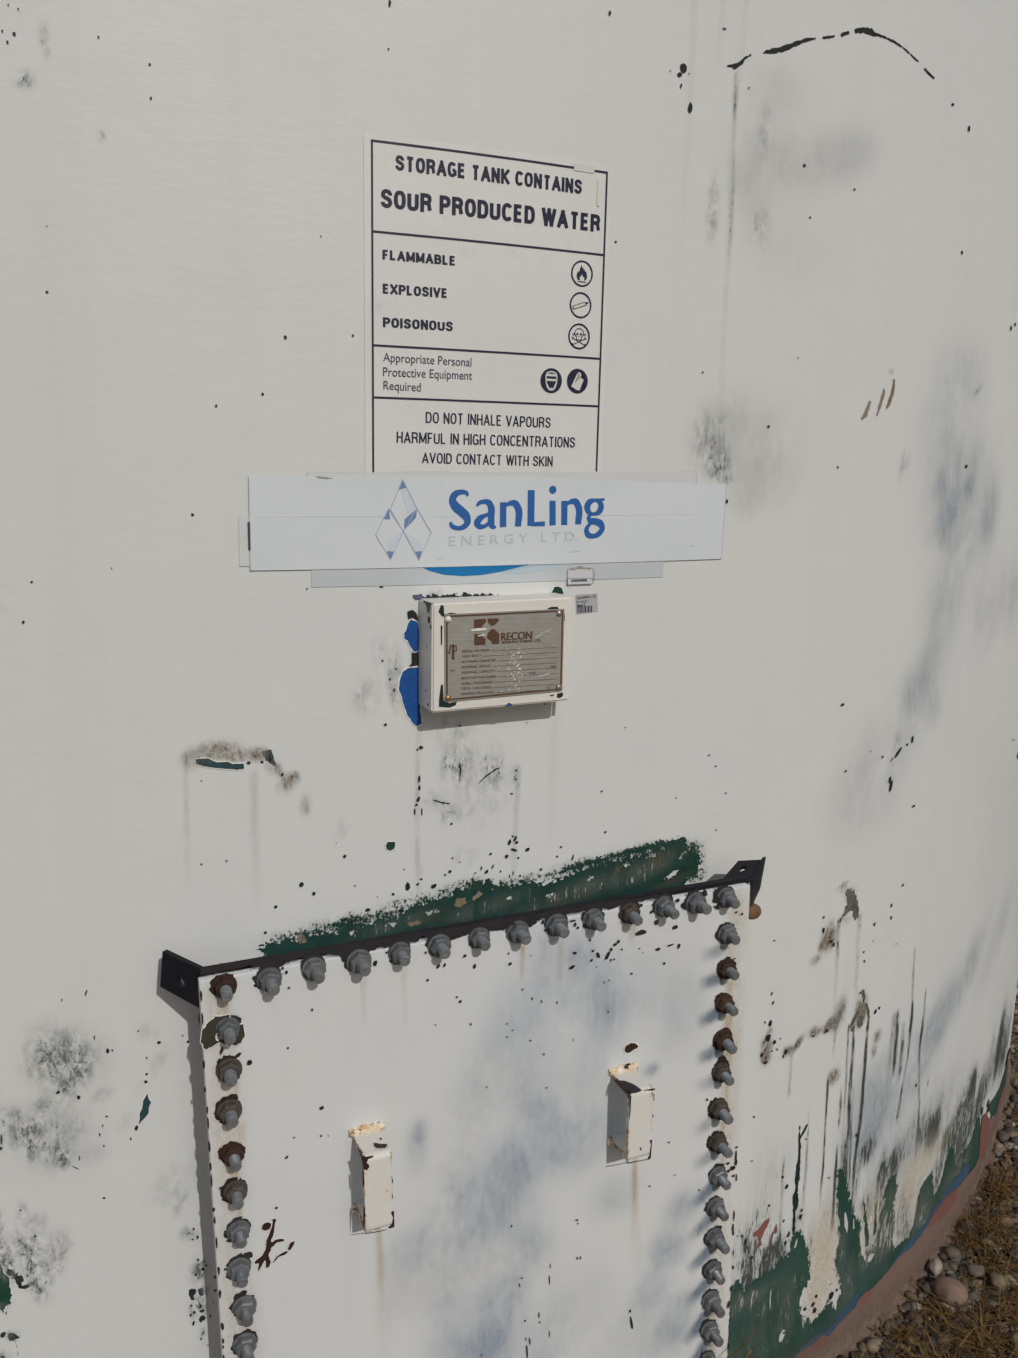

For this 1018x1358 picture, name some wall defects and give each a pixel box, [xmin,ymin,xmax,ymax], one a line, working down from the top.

crack [727,27,970,131]
peeling [186,744,298,787]
spalling [130,1057,152,1140]
peeling [182,835,743,1081]
peeling [850,989,880,1053]
damp [888,967,929,1156]
peeling [189,1087,296,1358]
peeling [699,1048,1010,1358]